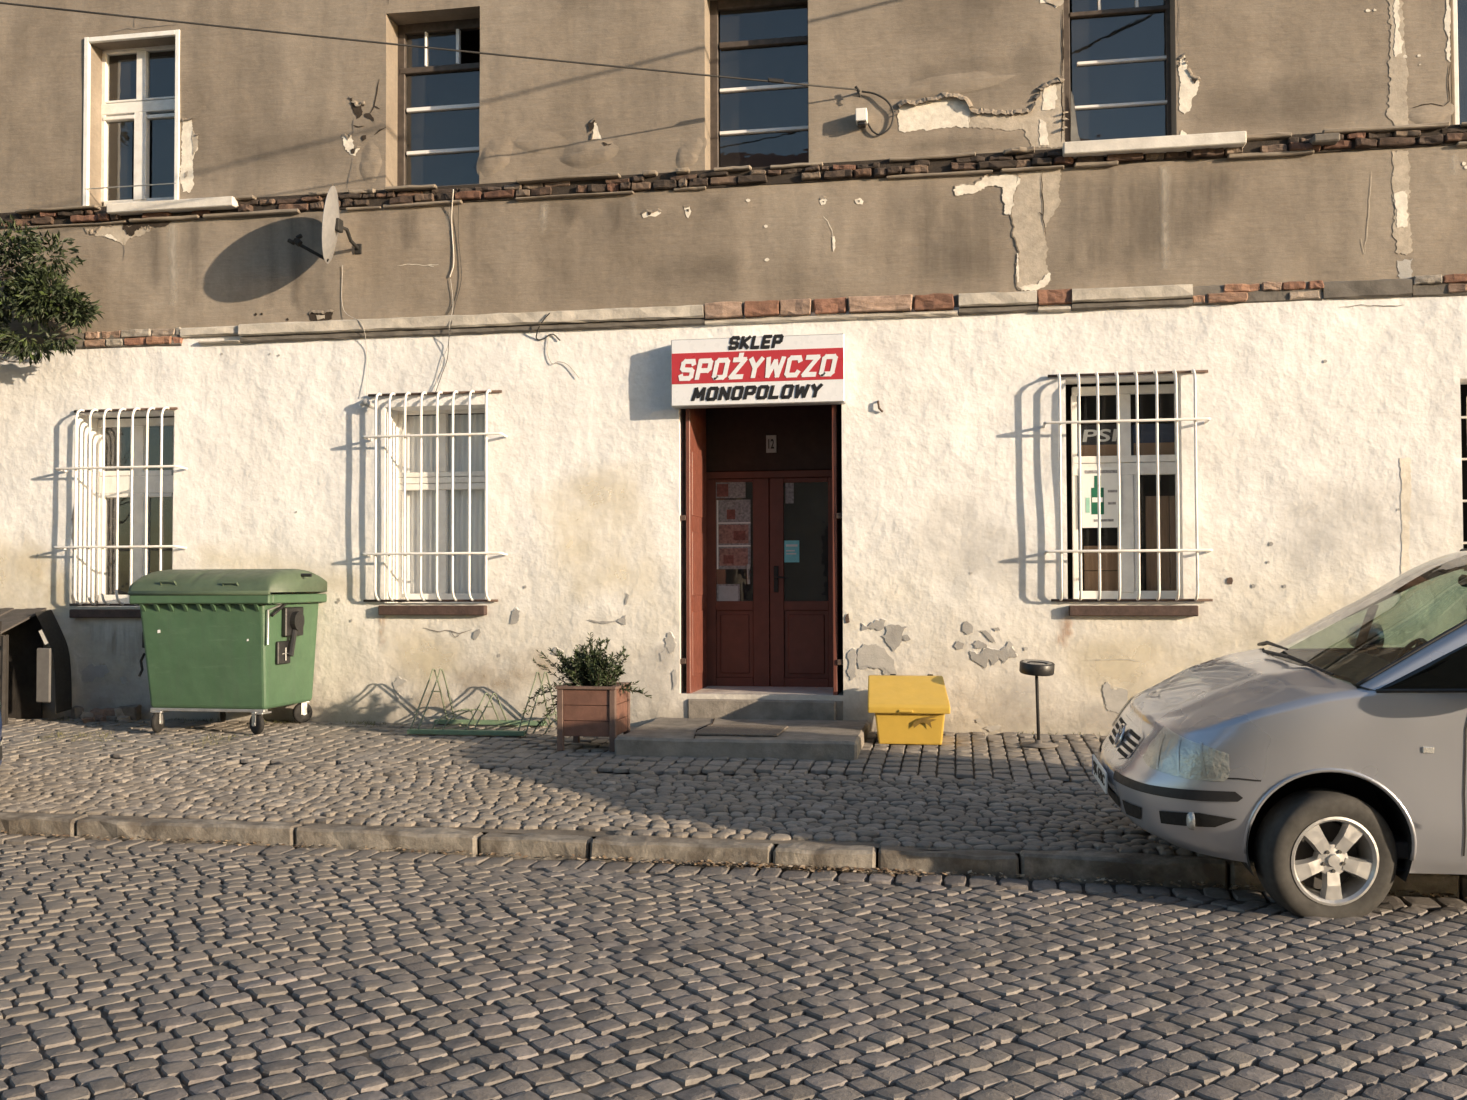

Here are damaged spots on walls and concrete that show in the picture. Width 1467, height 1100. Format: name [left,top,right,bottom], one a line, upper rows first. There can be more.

spalling [1040,0,1064,8]
spalling [179,118,198,193]
spalling [341,97,375,156]
spalling [588,117,611,146]
spalling [891,77,1069,148]
spalling [1177,53,1201,135]
spalling [84,221,171,245]
spalling [953,169,1072,306]
peeling [1394,191,1409,228]
peeling [845,613,911,681]
peeling [954,621,1028,669]